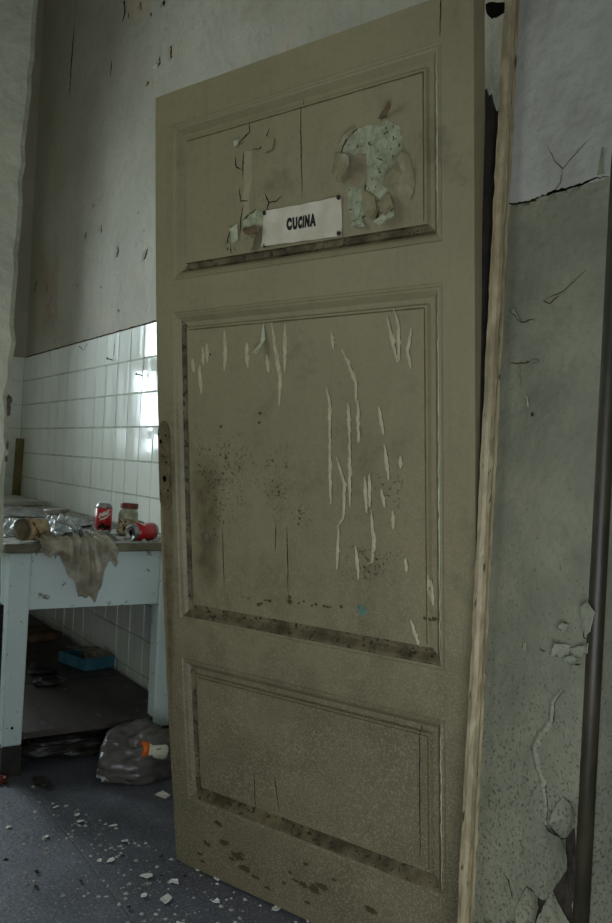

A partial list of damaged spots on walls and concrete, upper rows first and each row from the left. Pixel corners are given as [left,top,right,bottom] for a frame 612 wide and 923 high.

crack [509,141,609,208]
spalling [539,602,595,666]
peeling [503,780,577,923]